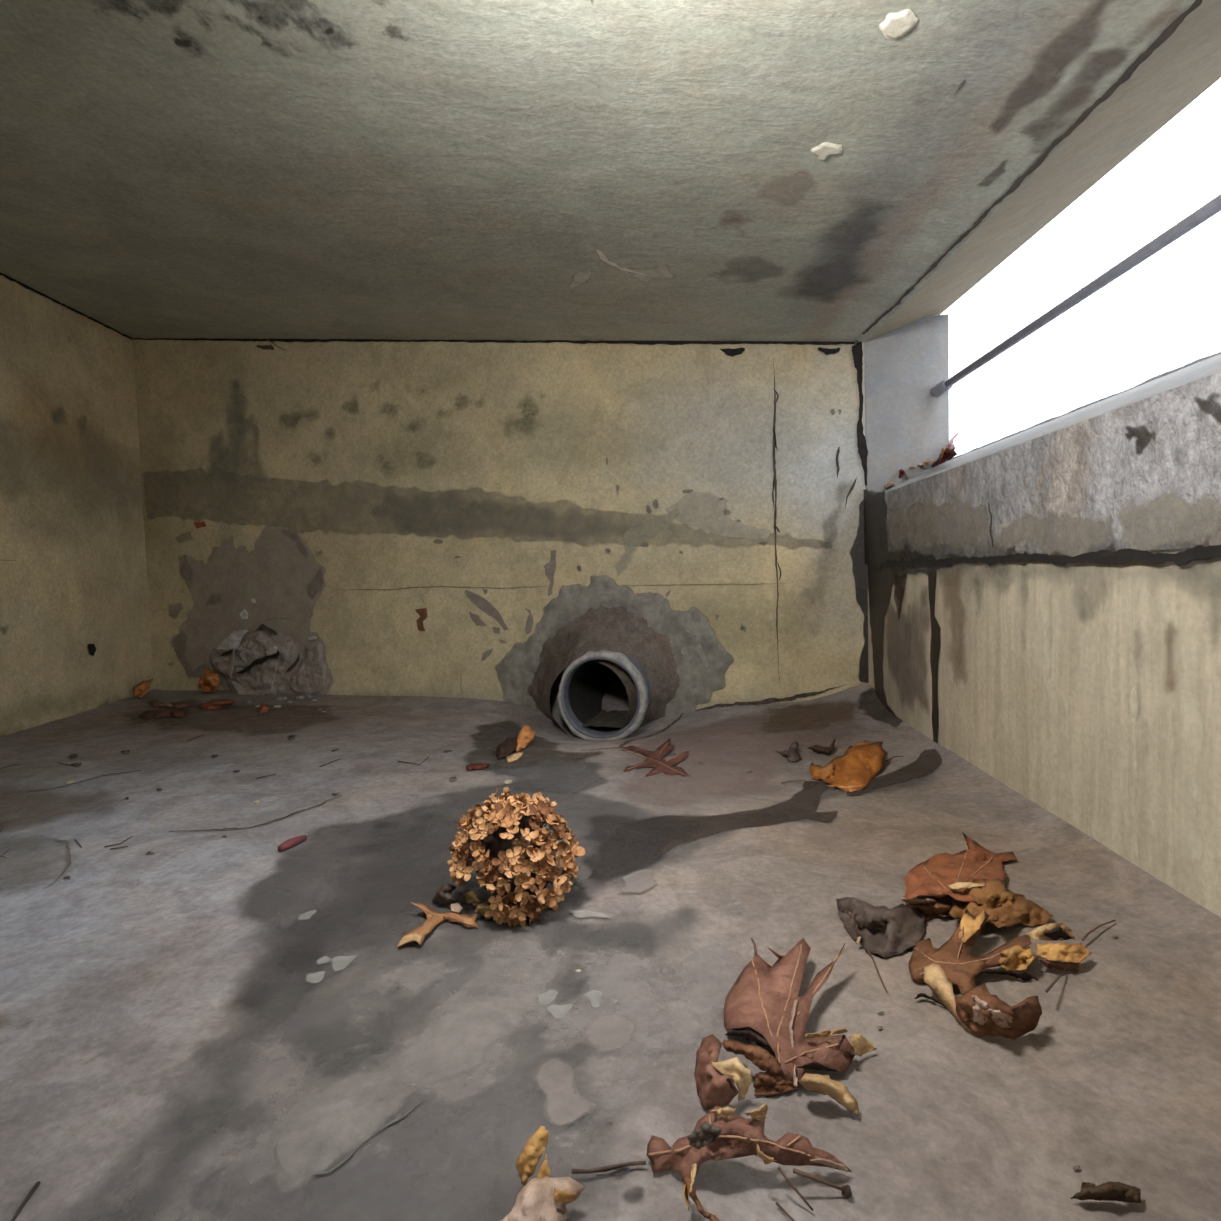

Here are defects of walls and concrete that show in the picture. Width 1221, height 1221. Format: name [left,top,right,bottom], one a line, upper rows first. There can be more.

water stain [993,0,1125,137]
water stain [798,207,882,300]
water stain [979,161,1006,186]
crack [0,0,1221,751]
peeling [170,527,326,690]
water stain [145,382,722,546]
spalling [465,589,508,661]
water stain [753,534,831,548]
water stain [850,489,1005,716]
water stain [74,749,942,1221]